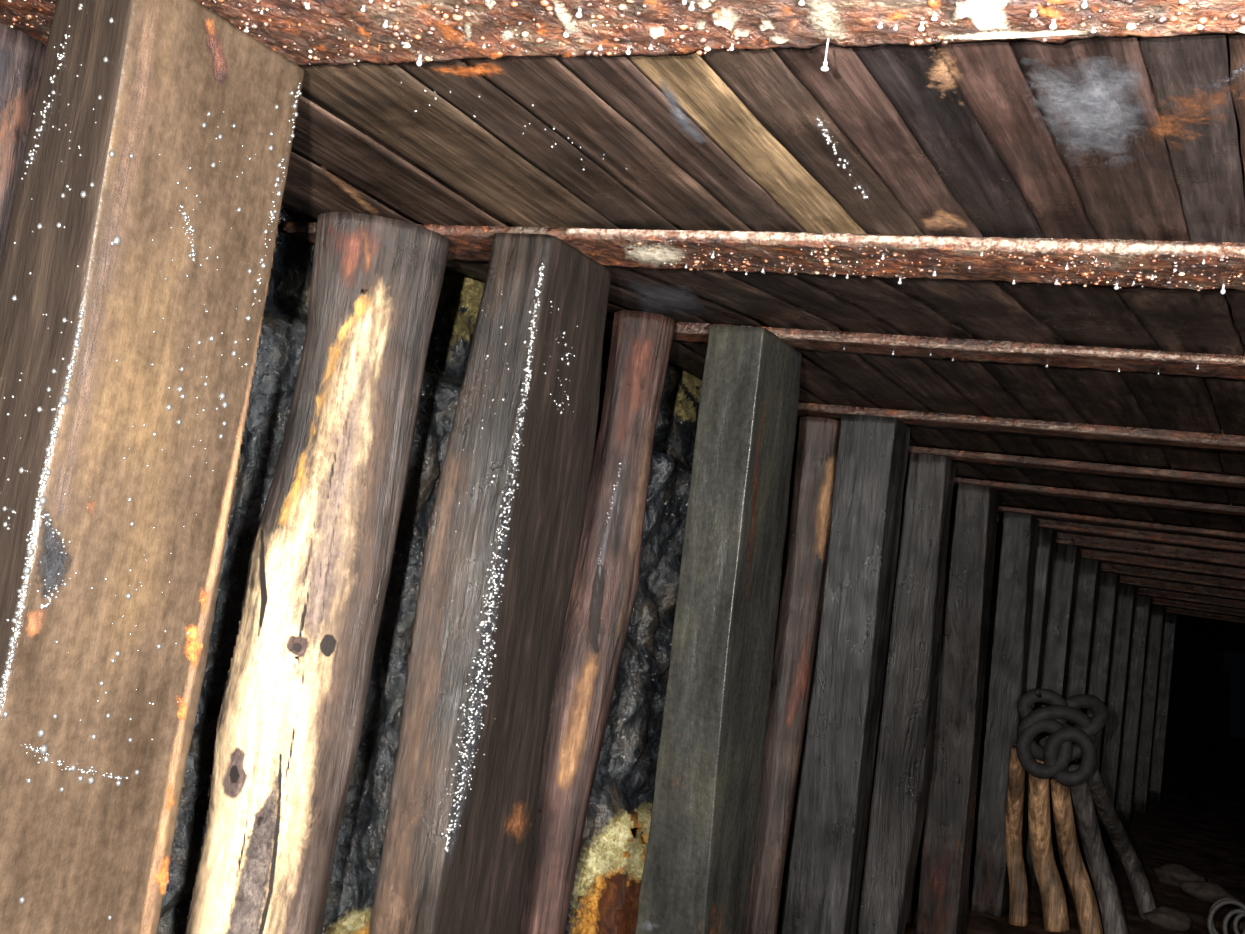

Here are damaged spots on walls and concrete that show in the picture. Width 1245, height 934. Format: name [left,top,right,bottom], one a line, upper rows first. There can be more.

corrosion [3,0,54,36]
corrosion [196,0,753,83]
corrosion [908,0,963,46]
damp [943,0,1086,40]
corrosion [1124,0,1245,30]
damp [1043,69,1133,149]
corrosion [637,240,956,279]
corrosion [987,251,1245,291]
damp [0,3,159,709]
corrosion [139,334,260,934]
damp [21,743,129,780]
crack [238,729,295,934]